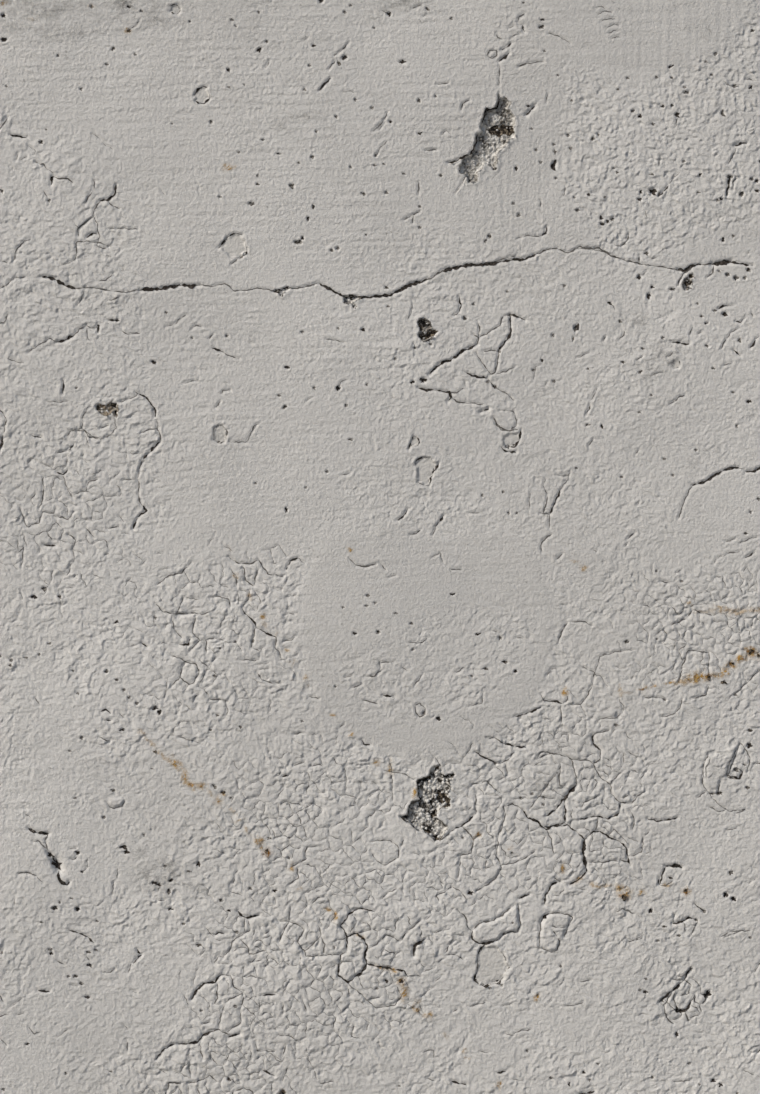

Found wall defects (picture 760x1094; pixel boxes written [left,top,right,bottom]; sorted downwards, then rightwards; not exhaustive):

spalling [448,94,516,193]
crack [0,119,759,431]
spalling [414,318,437,349]
crack [679,467,760,517]
crack [0,382,302,743]
rust [669,648,760,684]
spalling [400,765,455,841]
crack [140,537,760,1094]